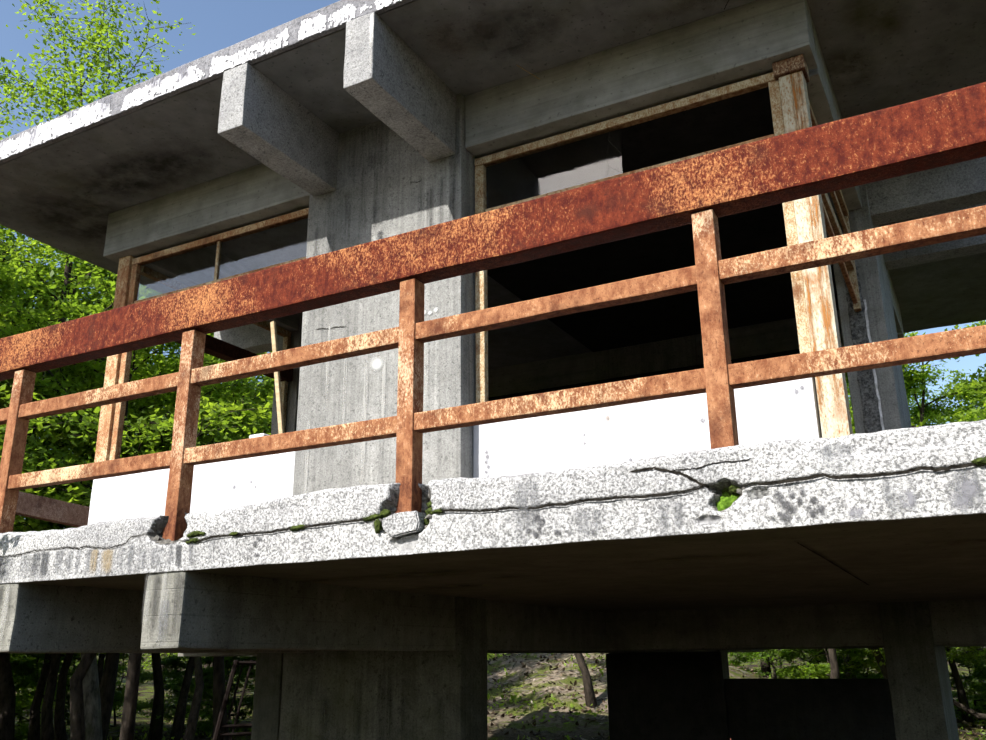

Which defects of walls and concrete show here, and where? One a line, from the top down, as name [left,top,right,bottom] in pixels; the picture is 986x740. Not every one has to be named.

peeling [0,0,401,159]
corrosion [790,71,805,129]
corrosion [808,196,818,239]
corrosion [805,266,835,352]
crack [0,535,141,557]
spalling [148,513,188,545]
crack [183,517,370,542]
spalling [376,486,432,553]
crack [432,458,978,513]
spalling [698,481,769,525]